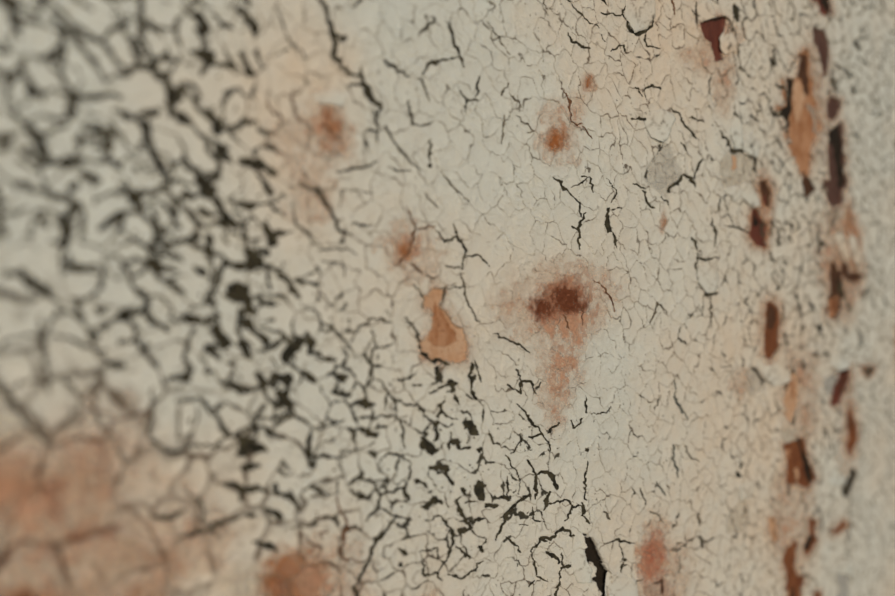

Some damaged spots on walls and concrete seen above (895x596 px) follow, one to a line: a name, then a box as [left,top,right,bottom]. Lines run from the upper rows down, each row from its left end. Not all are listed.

crack [568,0,660,54]
crack [266,0,480,281]
corrosion [542,106,576,152]
crack [553,108,757,250]
peeling [776,26,849,208]
crack [284,193,635,596]
corrosion [506,265,605,420]
peeling [751,301,798,421]
peeling [783,437,816,488]
corrosion [263,549,344,596]
peeling [583,534,674,596]
corrosion [635,527,677,593]